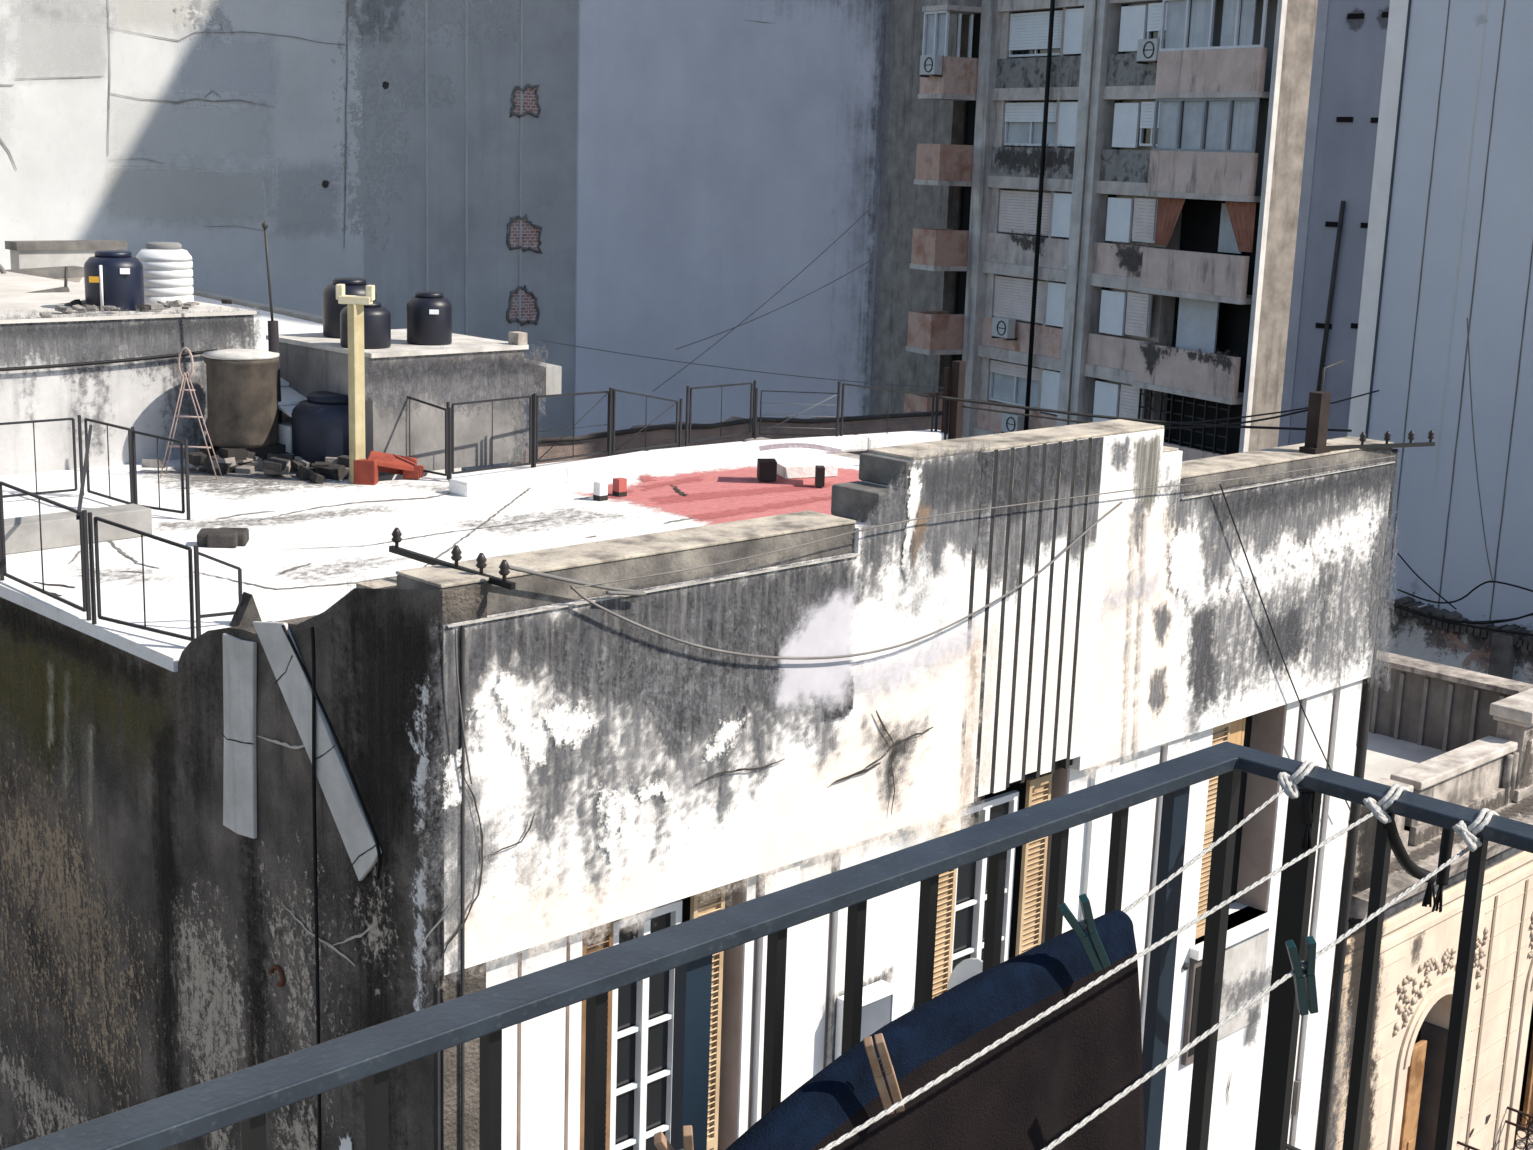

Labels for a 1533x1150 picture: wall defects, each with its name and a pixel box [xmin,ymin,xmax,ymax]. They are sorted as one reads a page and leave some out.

crack [0,0,349,249]
spalling [510,84,541,118]
spalling [506,214,542,254]
spalling [506,285,540,326]
water stain [0,307,361,499]
crack [831,710,933,815]
water stain [331,436,1491,1031]
water stain [1469,727,1533,818]
water stain [241,840,270,1066]
corrosion [270,964,285,987]
water stain [1222,967,1272,1044]
water stain [1320,918,1384,1150]